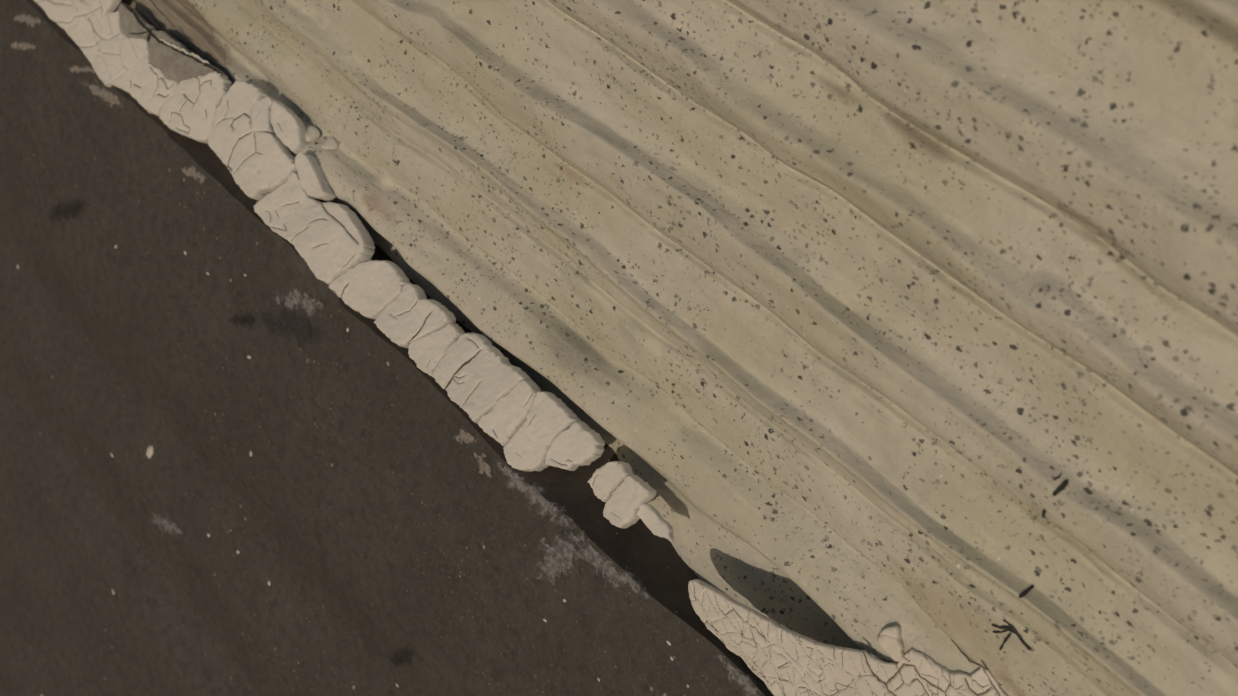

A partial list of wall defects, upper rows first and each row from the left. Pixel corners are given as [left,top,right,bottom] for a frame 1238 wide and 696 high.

crack [37,0,282,175]
crack [265,202,359,299]
peeling [34,0,674,542]
crack [390,302,481,405]
crack [691,582,1034,696]